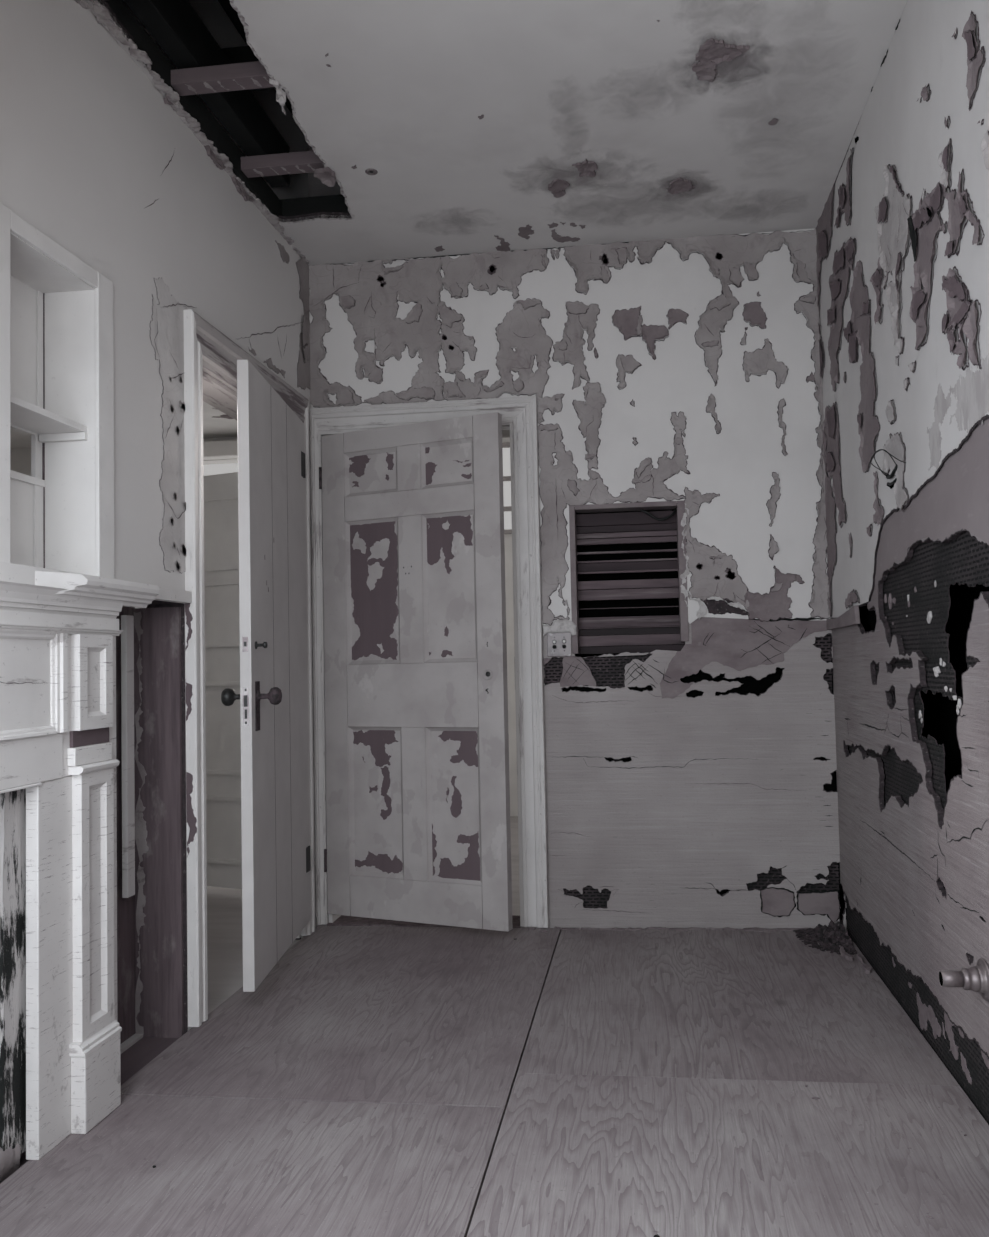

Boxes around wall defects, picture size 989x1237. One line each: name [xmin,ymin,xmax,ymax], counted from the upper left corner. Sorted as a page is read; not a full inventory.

water stain [692,38,751,82]
flaking render [74,0,355,265]
water stain [548,159,598,198]
water stain [664,178,695,195]
peeling [426,515,473,574]
peeling [350,521,399,660]
flaking render [843,354,989,829]
peeling [353,730,398,820]
peeling [438,731,478,818]
peeling [432,824,482,881]
crack [820,805,989,931]
flaking render [746,862,989,1125]